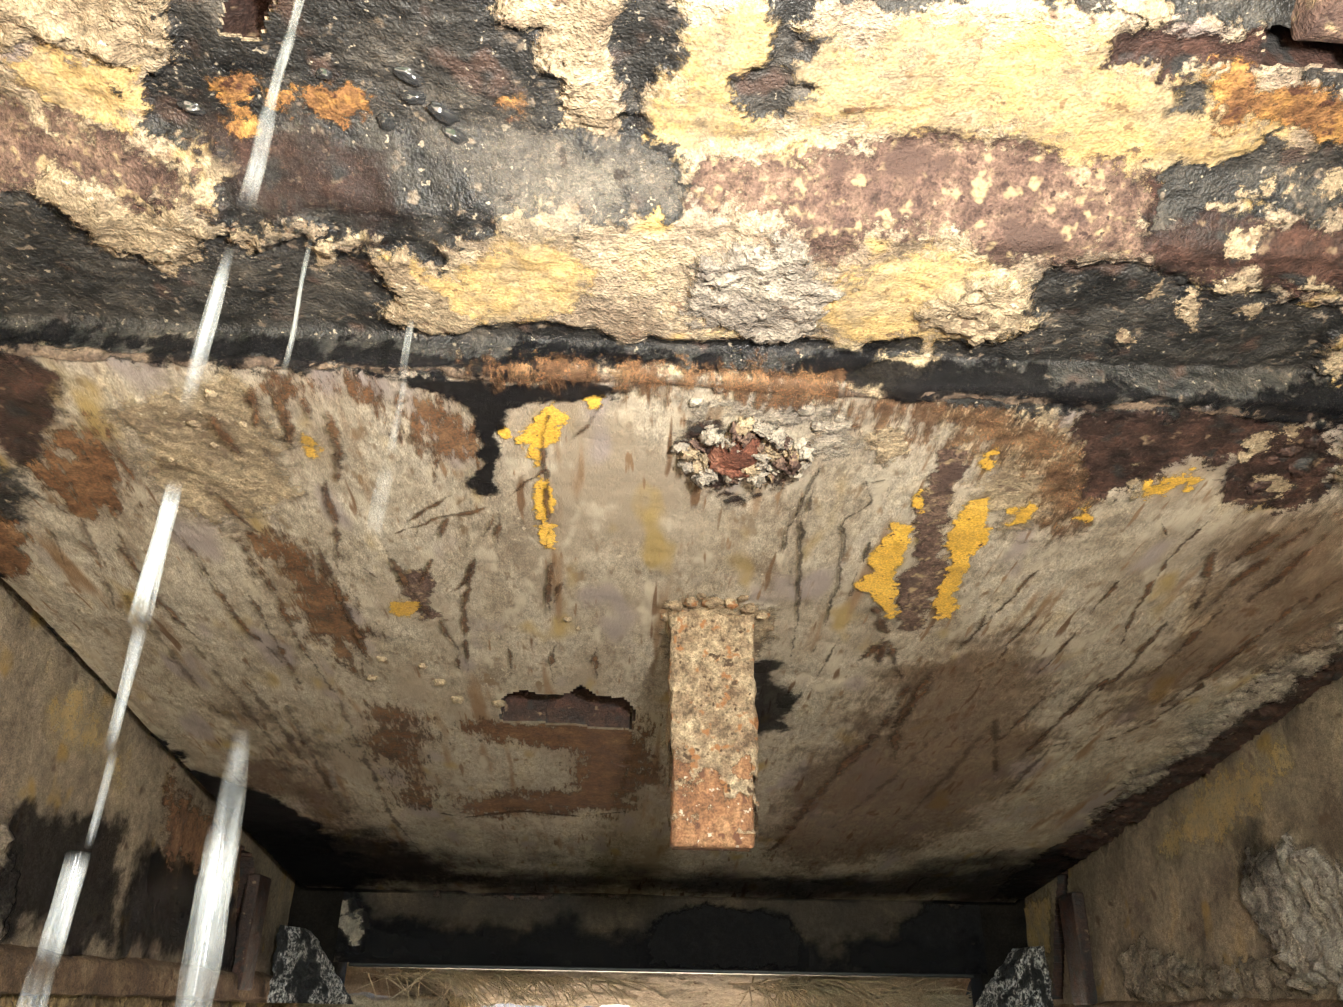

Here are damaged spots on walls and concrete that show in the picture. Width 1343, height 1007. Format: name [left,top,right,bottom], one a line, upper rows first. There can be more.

rust [0,69,393,240]
rust [496,92,530,124]
rust [1097,20,1343,145]
rust [0,511,36,584]
rust [24,408,210,683]
damp [172,750,331,842]
rust [167,367,485,690]
rust [209,670,667,858]
rust [395,497,502,543]
damp [754,660,801,735]
crack [783,468,888,673]
rust [456,349,1343,885]